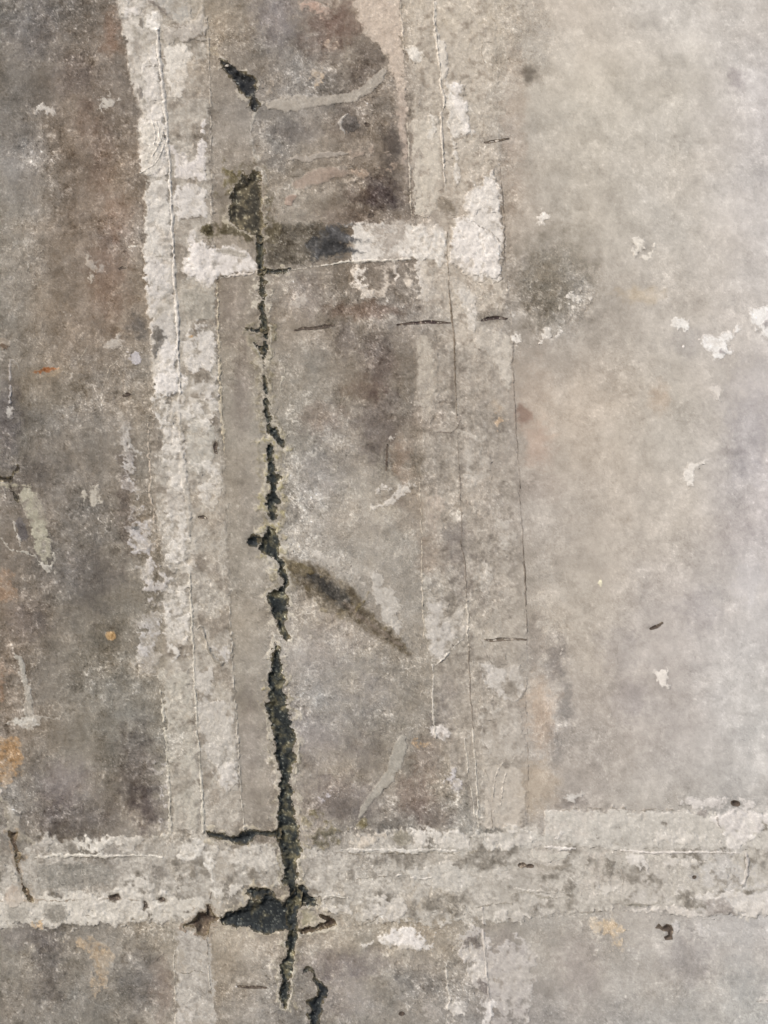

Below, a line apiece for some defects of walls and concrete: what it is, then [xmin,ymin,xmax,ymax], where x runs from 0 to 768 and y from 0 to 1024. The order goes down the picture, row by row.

leakage [295,0,331,21]
crack [208,46,265,172]
leakage [332,144,406,184]
leakage [303,219,376,260]
crack [203,234,378,1024]
leakage [278,553,417,661]